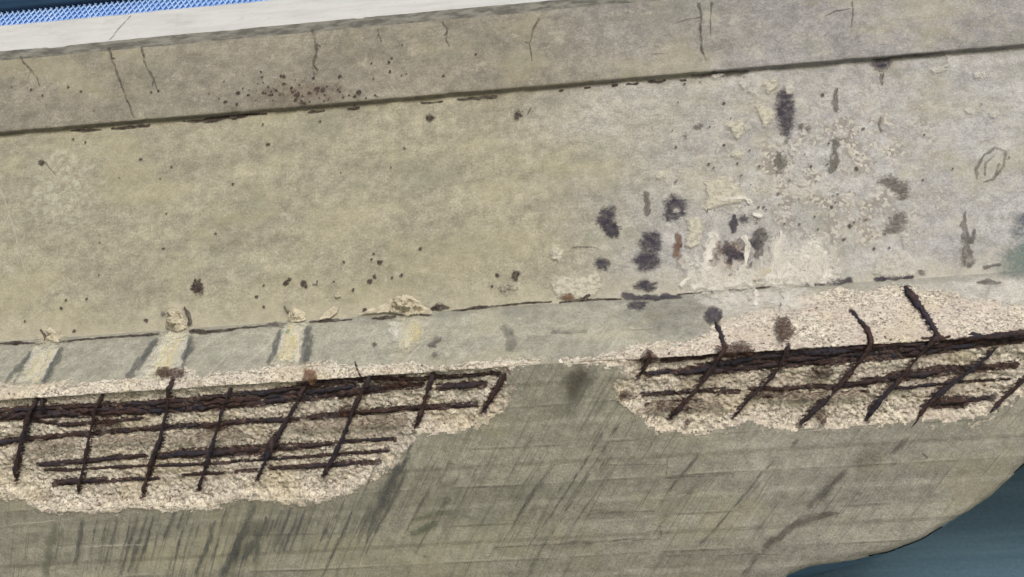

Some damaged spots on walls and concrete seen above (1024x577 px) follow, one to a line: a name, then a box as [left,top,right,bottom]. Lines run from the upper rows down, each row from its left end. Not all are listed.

crack [690,2,713,55]
water stain [774,89,811,173]
crack [975,148,1007,182]
water stain [643,191,651,216]
water stain [665,181,686,221]
water stain [0,196,852,384]
spalling [0,233,1024,519]